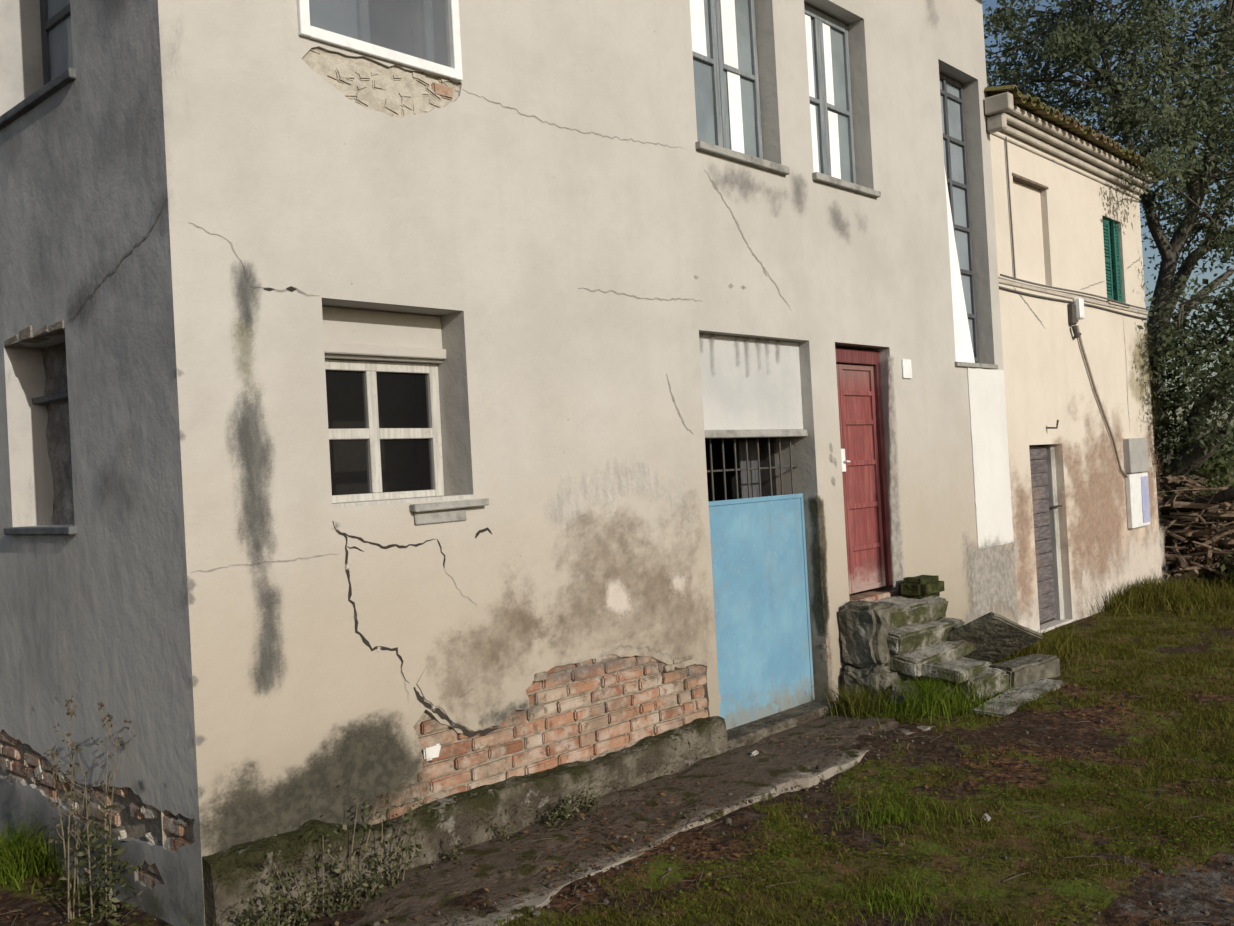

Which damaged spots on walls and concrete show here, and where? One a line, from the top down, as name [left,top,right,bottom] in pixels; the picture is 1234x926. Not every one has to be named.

flaking render [302,47,460,118]
crack [463,89,684,149]
crack [65,197,319,325]
damp [238,267,256,328]
crack [704,170,790,308]
damp [237,400,270,556]
damp [1060,420,1126,588]
damp [256,576,280,689]
crack [191,521,511,736]
flaking render [0,731,195,851]
damp [193,720,427,854]
flaking render [366,654,721,825]